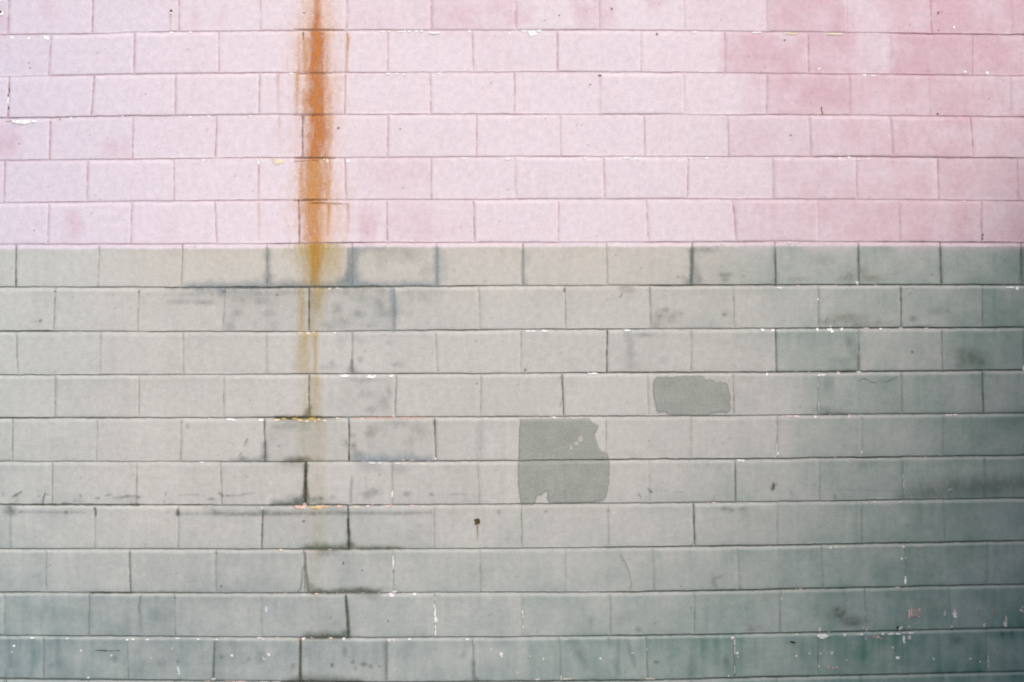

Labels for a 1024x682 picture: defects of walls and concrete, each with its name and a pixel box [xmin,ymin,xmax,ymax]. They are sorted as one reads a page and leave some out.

corrosion [296,0,337,299]